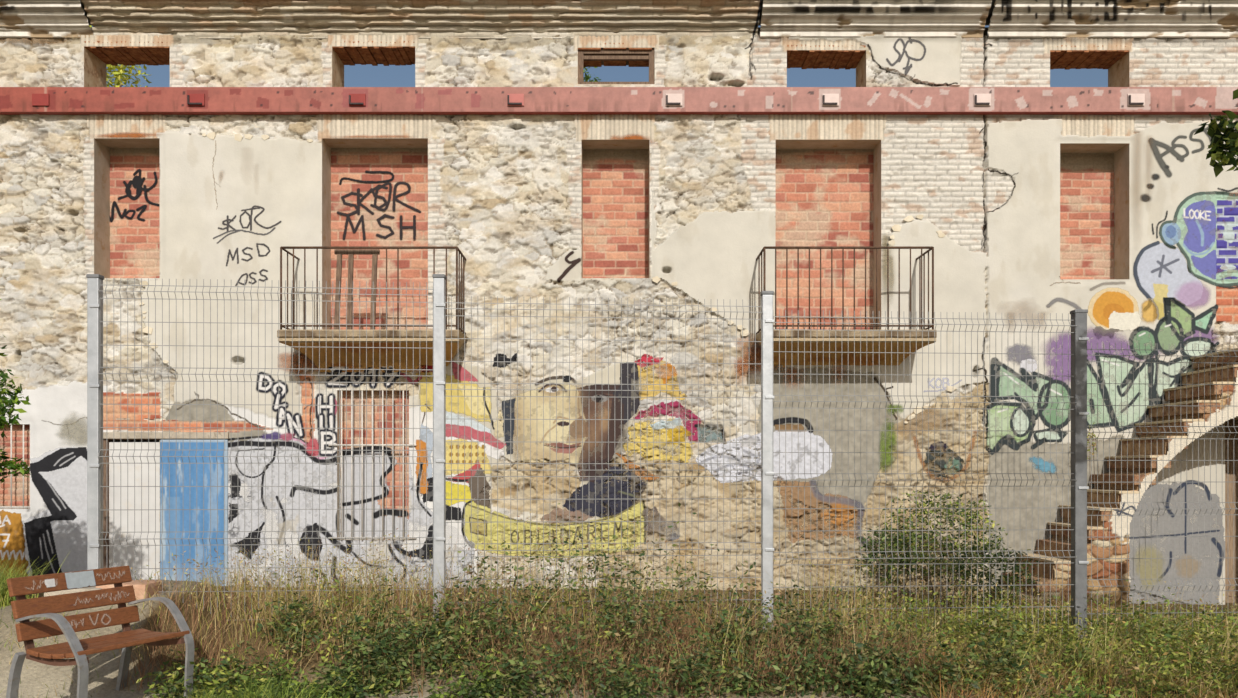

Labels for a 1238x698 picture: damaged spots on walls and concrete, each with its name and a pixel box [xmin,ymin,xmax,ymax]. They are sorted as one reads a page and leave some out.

crack [867,20,992,86]
crack [979,115,1018,251]
flaking render [0,114,1238,598]